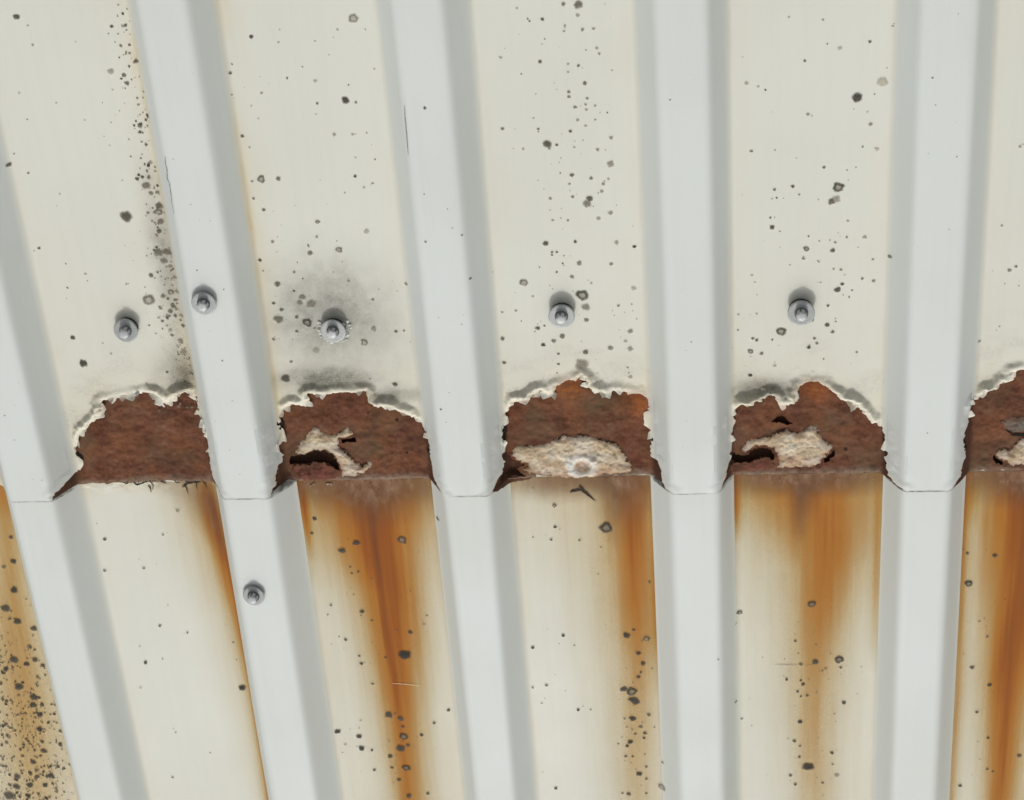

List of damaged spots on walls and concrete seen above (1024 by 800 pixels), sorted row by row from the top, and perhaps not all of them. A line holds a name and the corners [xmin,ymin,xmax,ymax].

corrosion [0,466,37,743]
corrosion [34,359,688,800]
corrosion [701,366,921,763]
corrosion [934,352,1024,800]